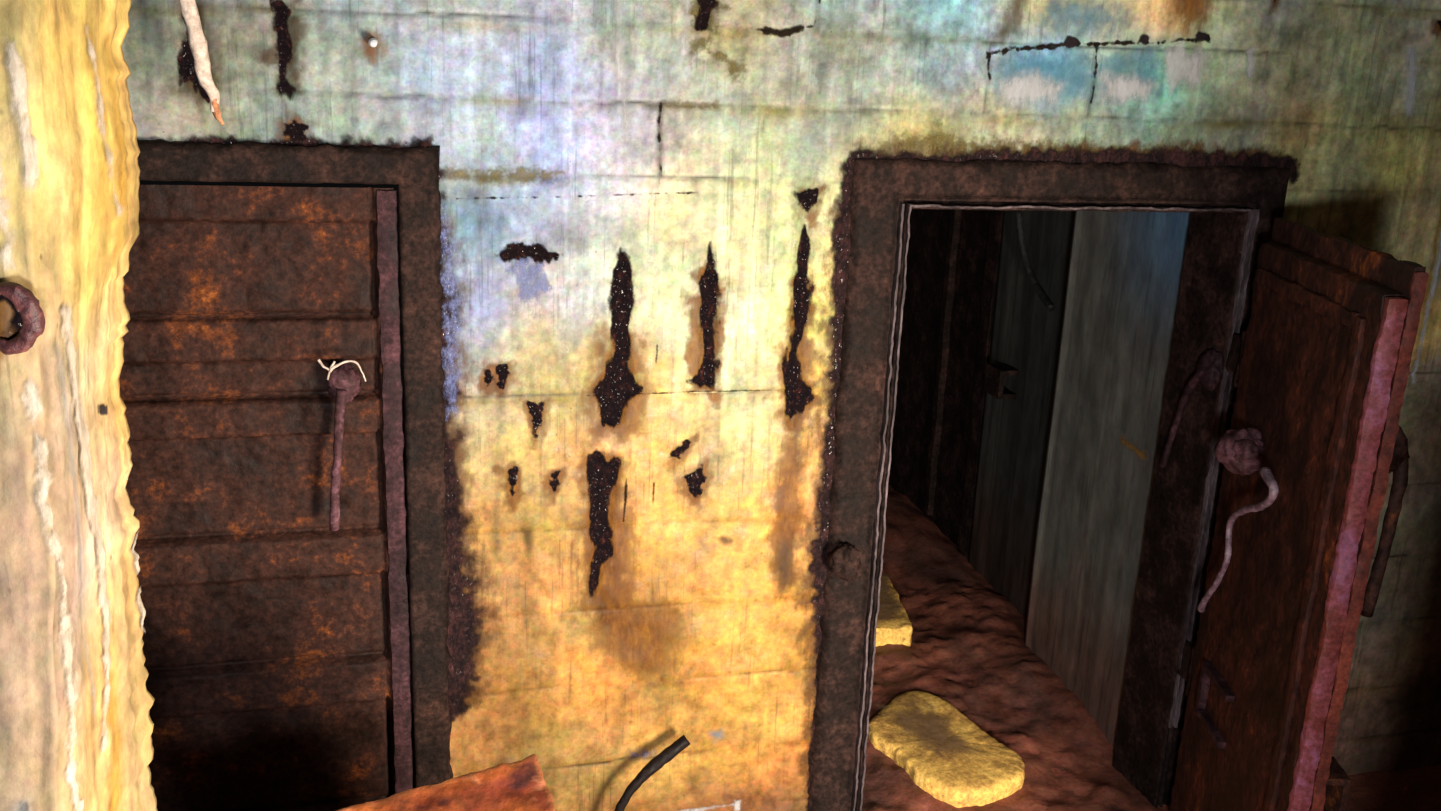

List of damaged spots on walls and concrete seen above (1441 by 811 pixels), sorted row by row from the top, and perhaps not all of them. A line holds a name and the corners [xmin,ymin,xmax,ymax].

spalling [261,0,304,100]
spalling [685,0,745,75]
crack [986,32,1210,104]
rust [1174,0,1209,33]
spalling [279,116,309,142]
spalling [500,243,559,299]
rust [0,295,23,340]
spalling [685,243,725,405]
spalling [767,186,826,593]
spalling [543,248,645,622]